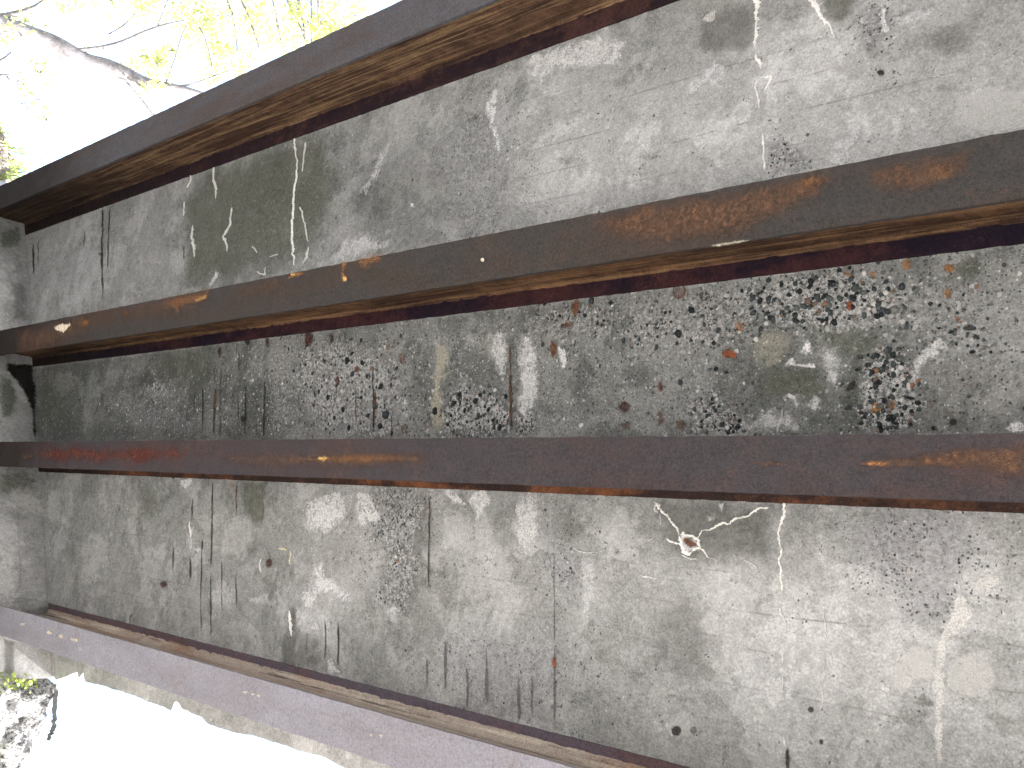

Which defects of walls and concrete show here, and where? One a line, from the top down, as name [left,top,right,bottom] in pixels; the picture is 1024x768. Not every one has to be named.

crack [753,0,772,170]
crack [808,0,836,41]
crack [183,138,309,276]
rust [609,182,817,240]
crack [648,501,787,690]
water stain [877,573,999,760]
crack [782,735,790,768]